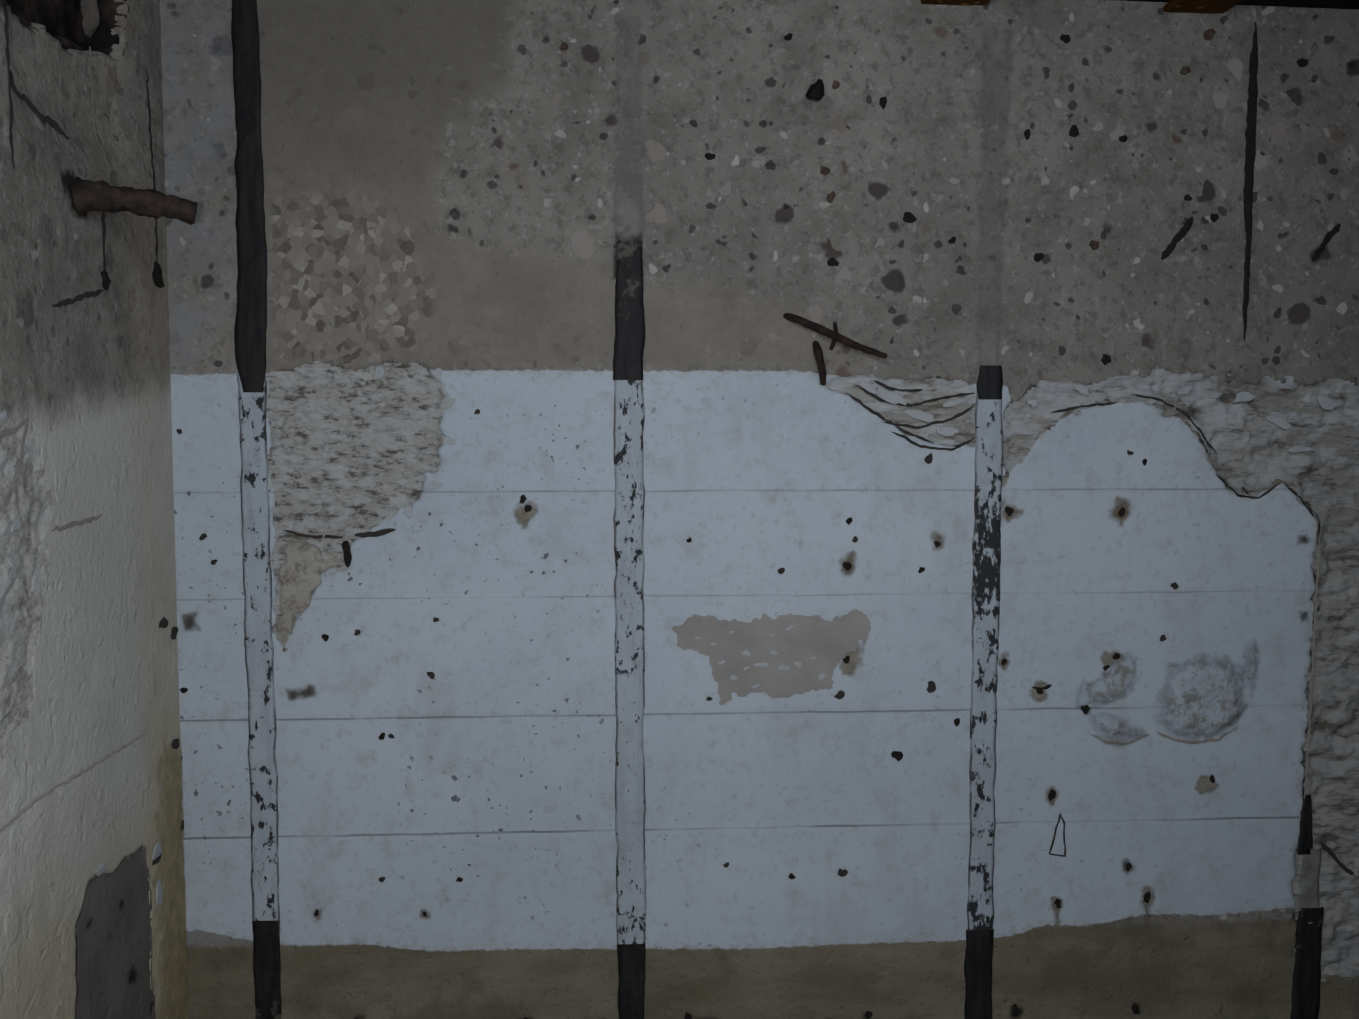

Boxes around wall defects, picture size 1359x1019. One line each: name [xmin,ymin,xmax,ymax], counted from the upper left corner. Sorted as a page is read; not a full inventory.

hole [0,0,129,172]
rust [62,171,198,225]
peeling [818,375,977,464]
spalling [0,420,54,761]
spalling [266,361,456,652]
peeling [672,609,871,705]
spalling [1002,366,1359,982]